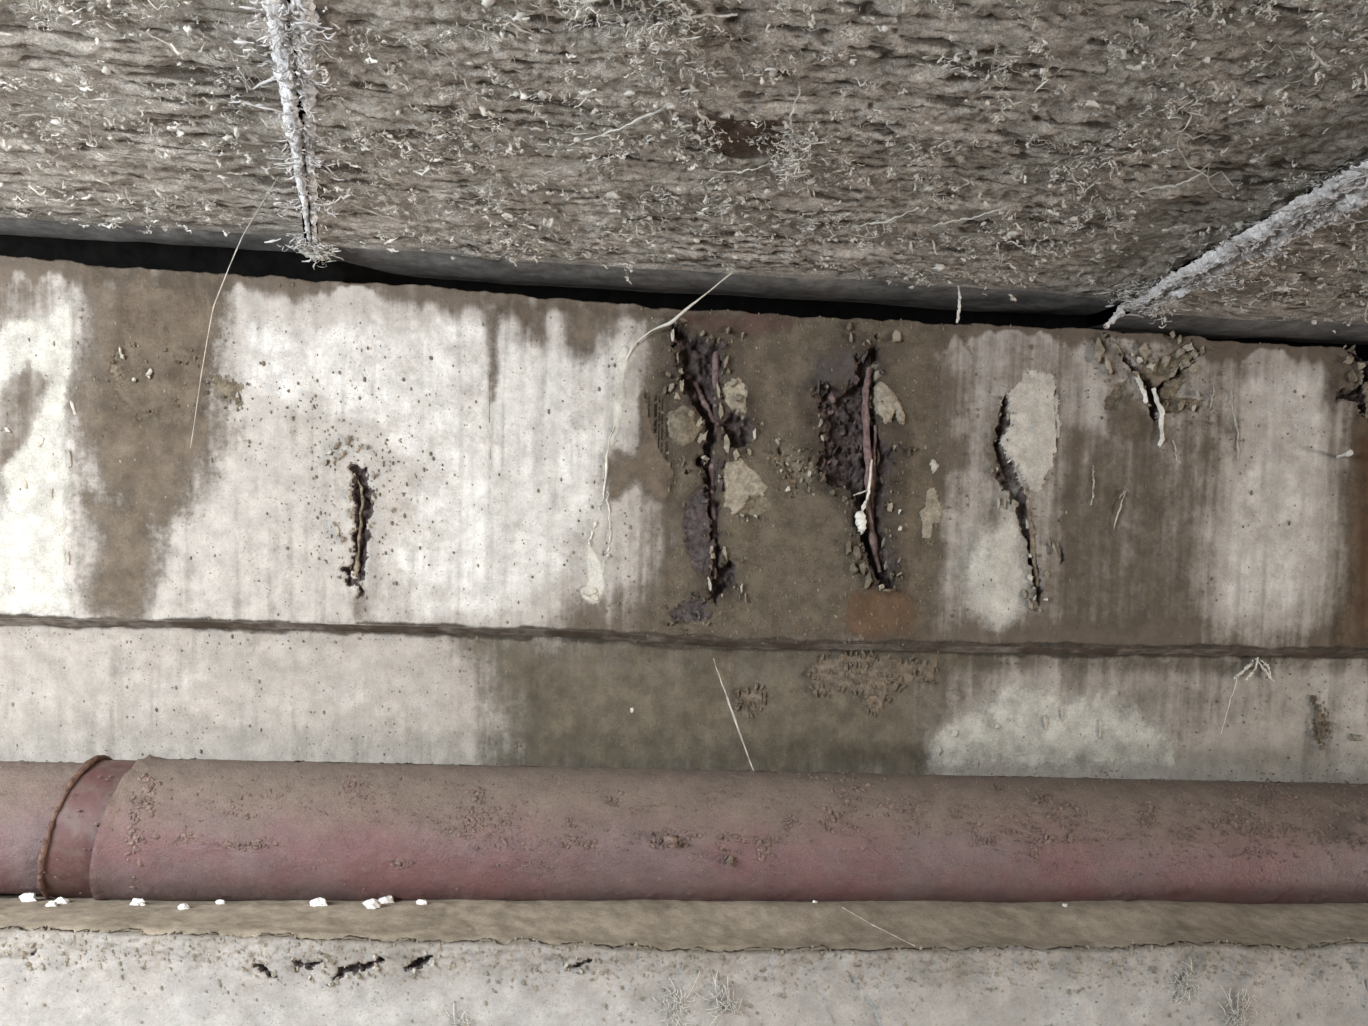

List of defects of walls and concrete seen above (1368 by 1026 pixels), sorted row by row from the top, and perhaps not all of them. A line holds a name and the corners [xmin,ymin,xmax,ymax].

water stain [0,267,1368,774]
spalling [663,318,916,631]
spalling [1094,331,1205,447]
rust [1333,402,1368,649]
spalling [1335,345,1368,418]